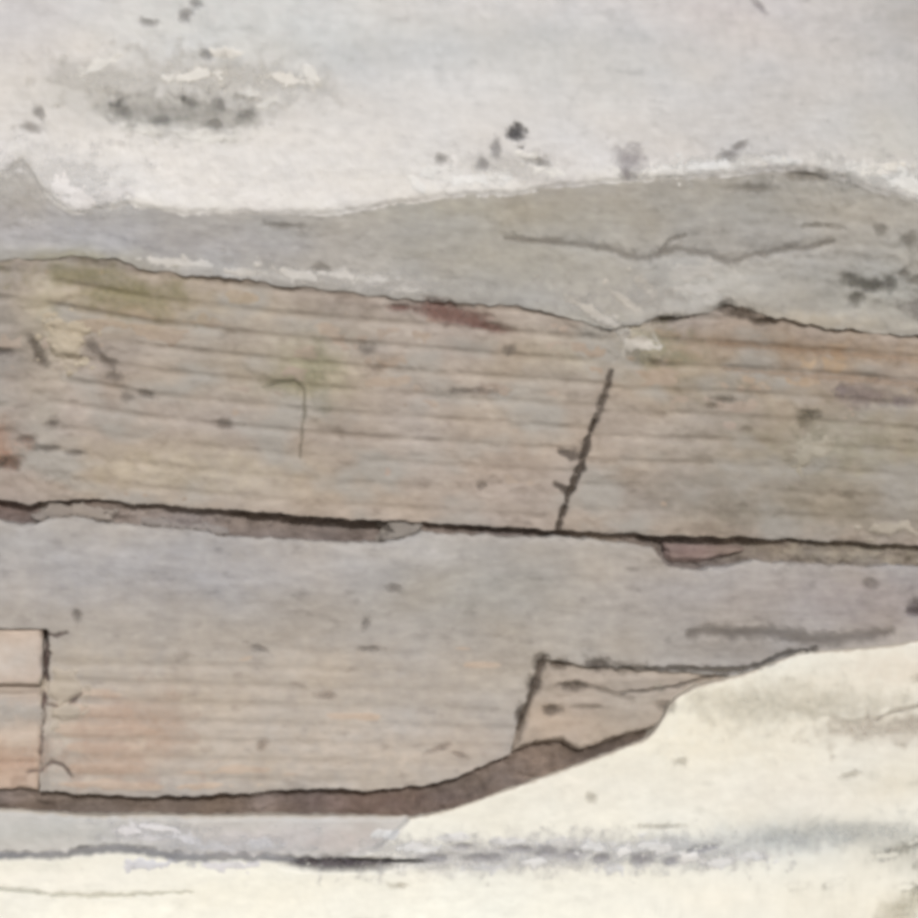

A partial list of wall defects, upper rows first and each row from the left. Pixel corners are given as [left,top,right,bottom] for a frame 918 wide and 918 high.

flaking render [144,45,322,117]
flaking render [107,114,251,146]
spalling [0,124,918,797]
crack [551,369,613,531]
crack [28,629,80,776]
crack [516,655,545,729]
crack [617,647,817,673]
flaking render [103,818,288,874]
flaking render [362,829,779,879]